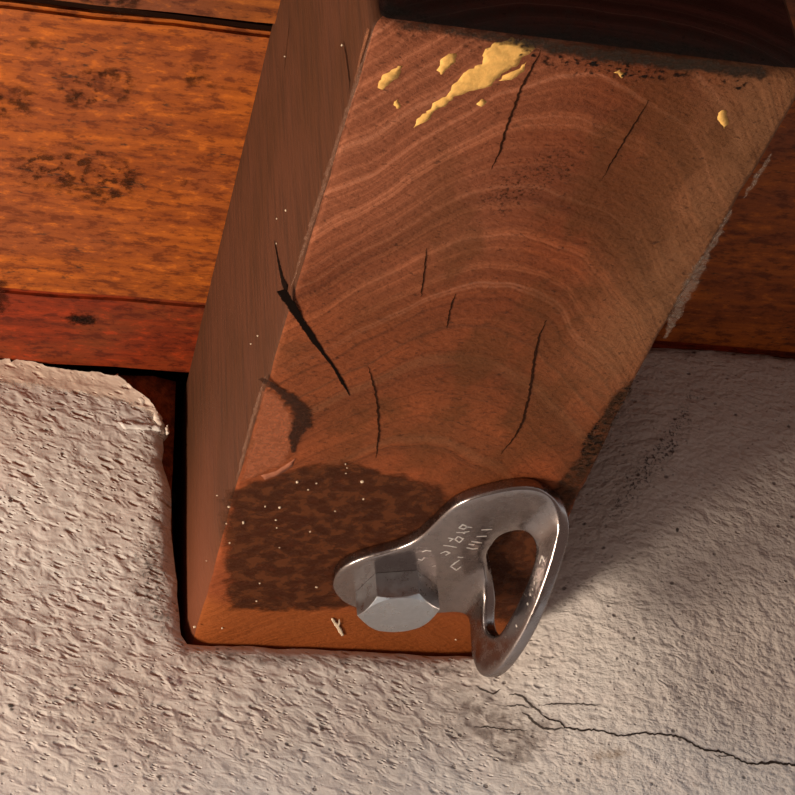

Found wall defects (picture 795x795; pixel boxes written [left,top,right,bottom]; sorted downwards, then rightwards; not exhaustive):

water stain [23,155,134,198]
spalling [378,66,402,90]
spalling [414,37,535,127]
crack [491,50,541,169]
crack [602,102,648,179]
crack [368,367,381,456]
crack [501,320,547,454]
water stain [222,463,447,611]
water stain [487,530,536,621]
crack [475,685,795,766]